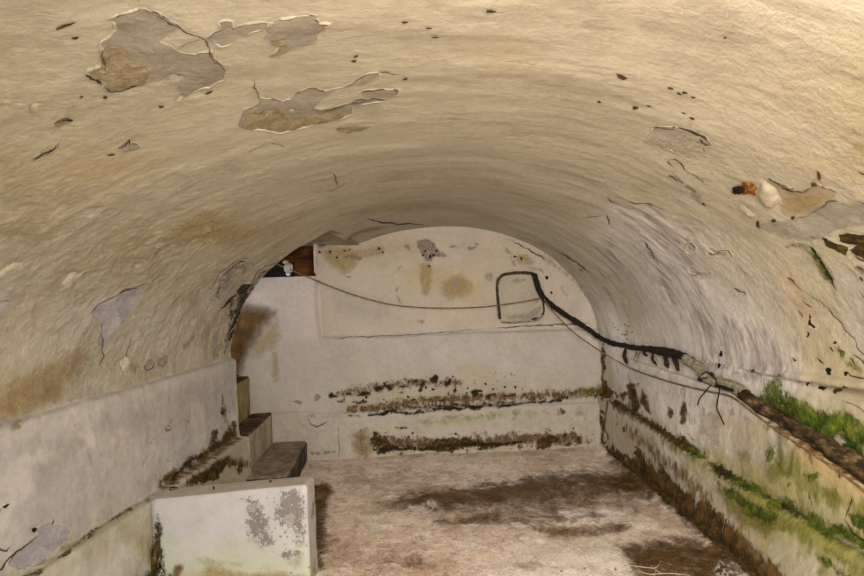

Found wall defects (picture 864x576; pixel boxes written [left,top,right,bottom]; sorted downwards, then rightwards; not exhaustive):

flaking render [83,6,332,103]
flaking render [236,72,408,136]
flaking render [756,170,864,282]
flaking render [88,280,149,363]
water stain [329,372,600,417]
water stain [356,427,582,457]
water stain [615,383,651,423]
water stain [665,401,687,429]
flaking render [240,489,315,560]
water stain [315,483,331,568]